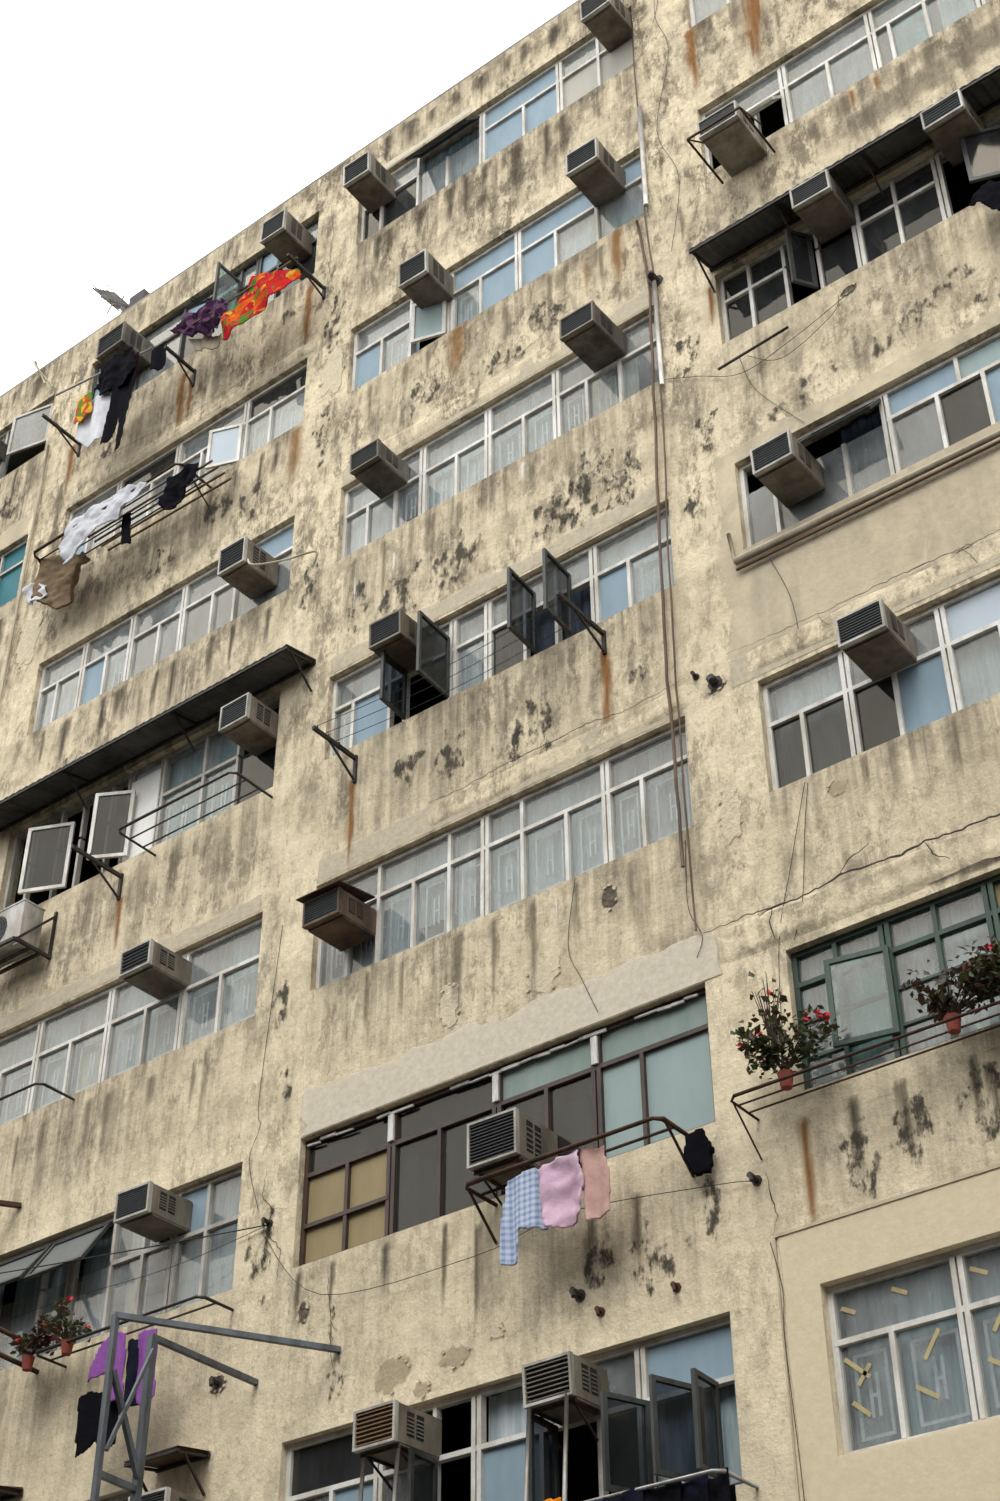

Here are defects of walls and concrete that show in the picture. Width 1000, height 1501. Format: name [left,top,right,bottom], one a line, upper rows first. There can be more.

rust [686,31,696,75]
rust [749,0,760,51]
damp [675,336,699,377]
damp [695,409,718,452]
damp [533,450,643,537]
damp [684,489,699,518]
damp [348,529,480,632]
rust [601,654,609,713]
crack [704,813,1000,938]
rust [802,1121,812,1206]